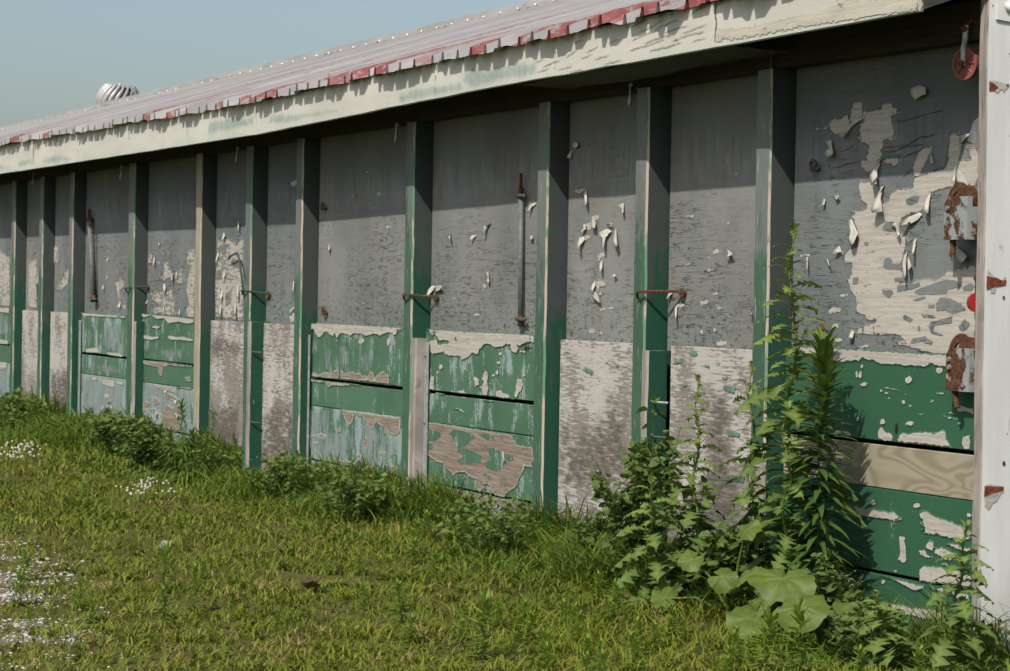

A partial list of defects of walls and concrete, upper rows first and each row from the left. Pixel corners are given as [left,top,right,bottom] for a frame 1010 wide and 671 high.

peeling [0,250,10,344]
peeling [215,222,244,321]
peeling [577,215,618,311]
peeling [814,99,978,407]
rust [986,271,1007,299]
peeling [310,322,402,388]
peeling [426,329,535,414]
peeling [427,422,533,517]
peeling [842,500,902,522]
peeling [878,414,970,449]
peeling [881,503,972,603]
rust [984,484,1004,510]